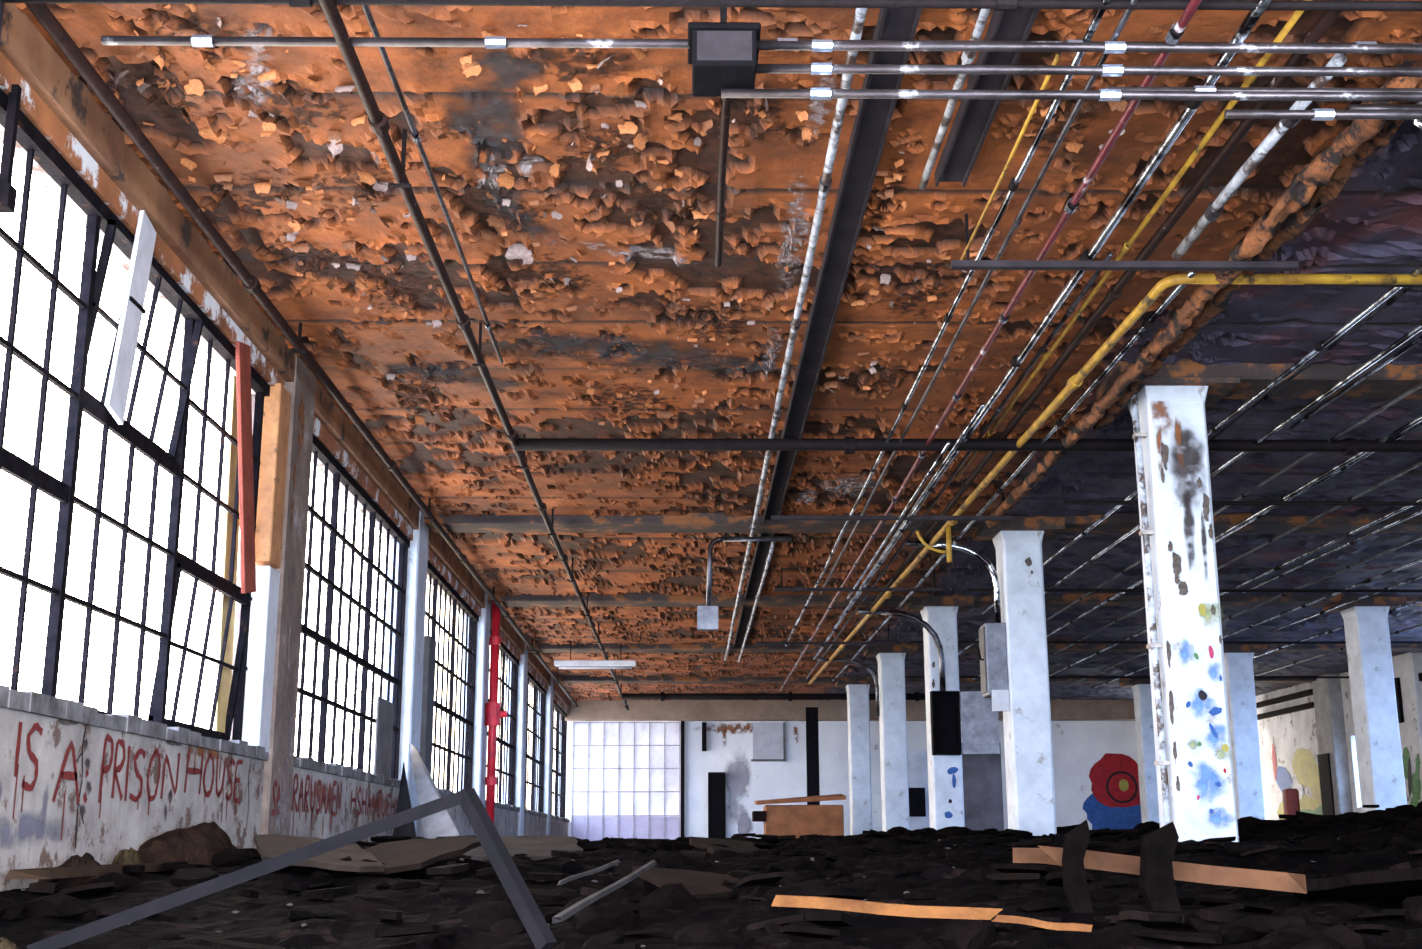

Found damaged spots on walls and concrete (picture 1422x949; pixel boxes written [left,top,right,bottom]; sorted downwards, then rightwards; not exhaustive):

peeling [460,54,482,78]
peeling [96,4,448,328]
peeling [507,33,709,249]
peeling [694,73,812,147]
peeling [866,137,911,249]
peeling [1024,79,1128,154]
peeling [453,165,591,312]
peeling [664,293,776,355]
peeling [851,244,977,328]
spalling [1161,442,1169,483]
spalling [1168,541,1188,595]
spalling [1169,690,1180,791]